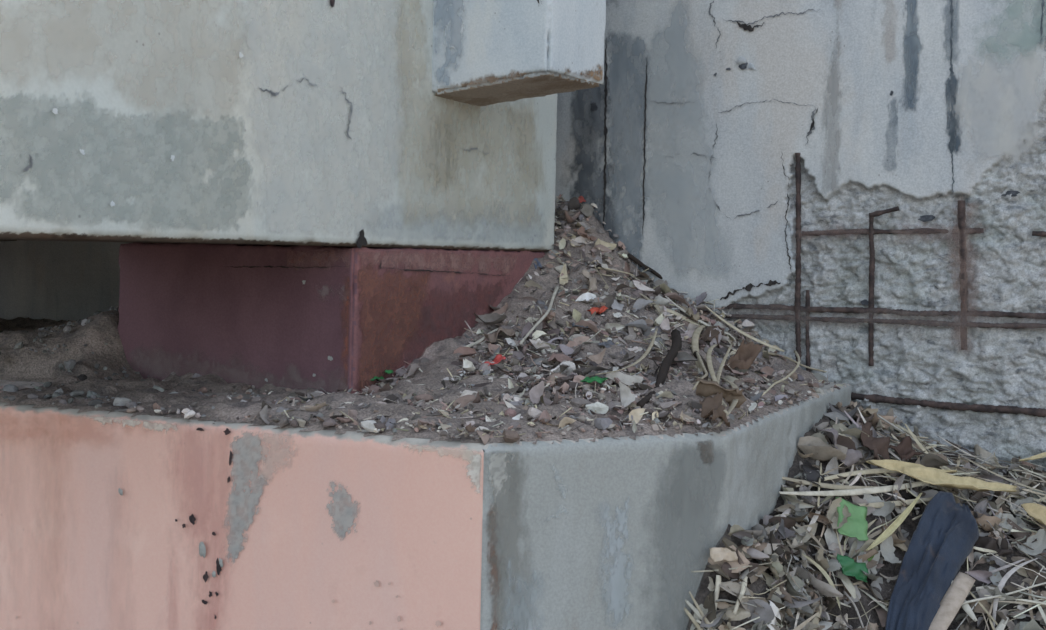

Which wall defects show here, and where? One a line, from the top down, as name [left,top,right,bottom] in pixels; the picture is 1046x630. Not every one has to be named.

flaking render [713,56,755,77]
crack [709,1,819,47]
water stain [904,0,922,110]
water stain [945,0,958,59]
water stain [946,75,961,153]
crack [654,99,818,300]
spalling [716,92,1046,471]
peeling [199,428,266,604]
peeling [327,482,357,538]